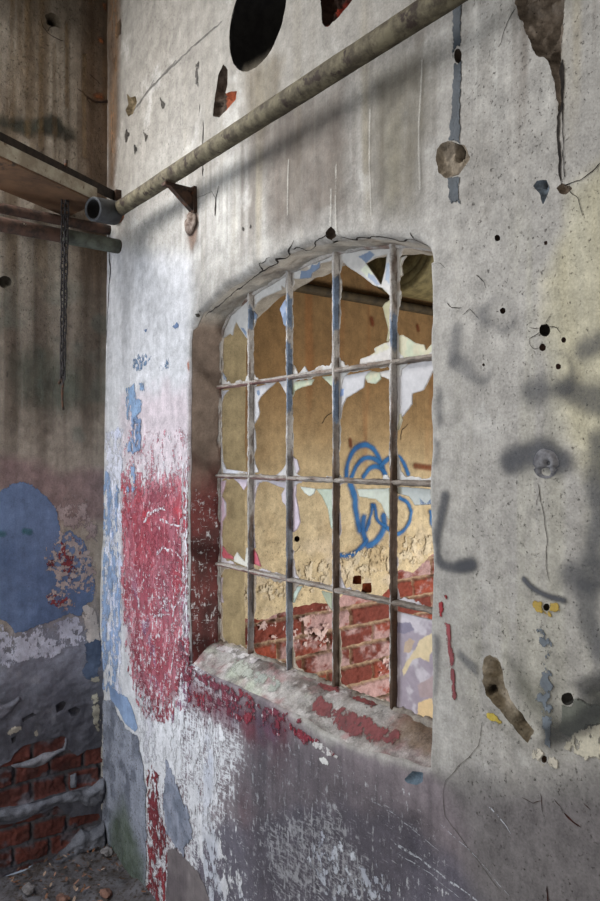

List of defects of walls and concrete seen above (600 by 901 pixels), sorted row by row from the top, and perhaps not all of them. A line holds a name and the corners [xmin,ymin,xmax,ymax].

flaking render [213,65,237,117]
flaking render [515,0,565,112]
flaking render [436,141,470,178]
crack [206,233,445,315]
peeling [0,383,434,901]
flaking render [482,629,574,769]
peeling [564,724,600,761]